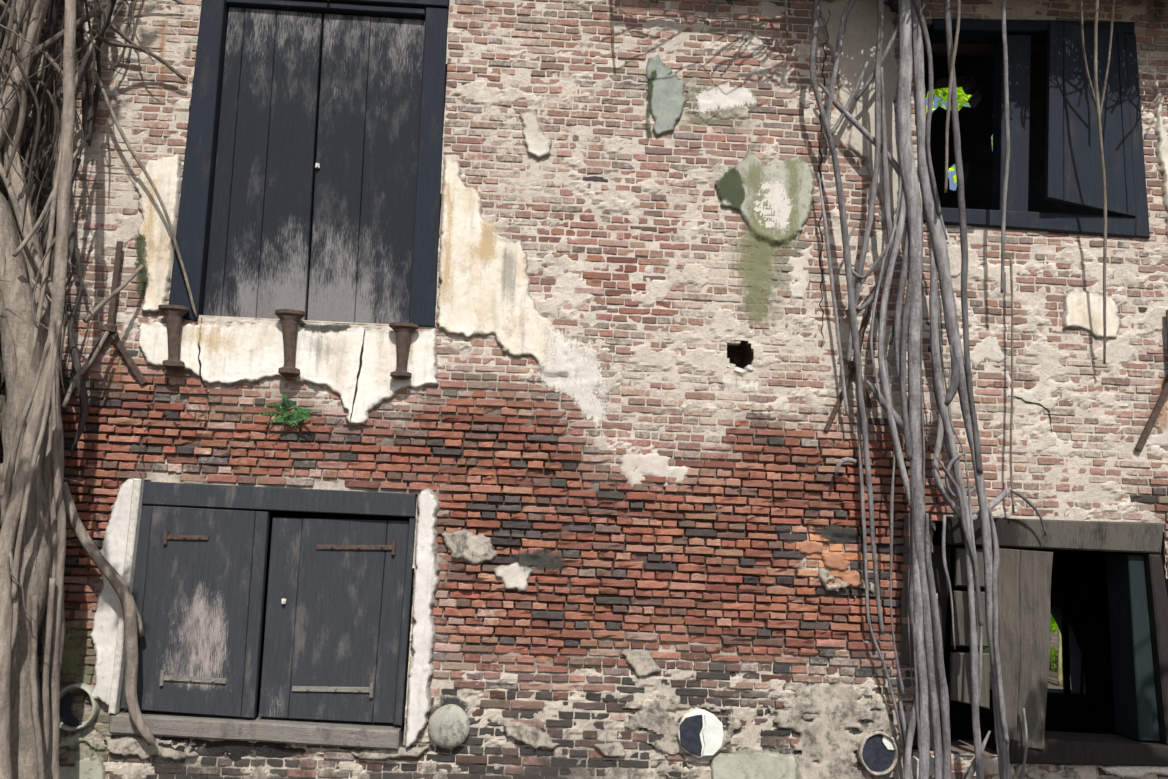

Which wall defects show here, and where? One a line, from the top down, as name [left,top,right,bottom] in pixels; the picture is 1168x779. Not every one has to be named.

flaking render [645,55,757,138]
flaking render [134,153,609,438]
crack [350,329,366,421]
spalling [722,340,761,391]
spalling [798,540,865,588]
flaking render [622,649,661,677]
flaking render [503,722,560,749]
flaking render [594,742,626,757]
flaking render [623,679,934,779]
flaking render [1012,764,1081,779]
flaking render [1098,765,1168,779]